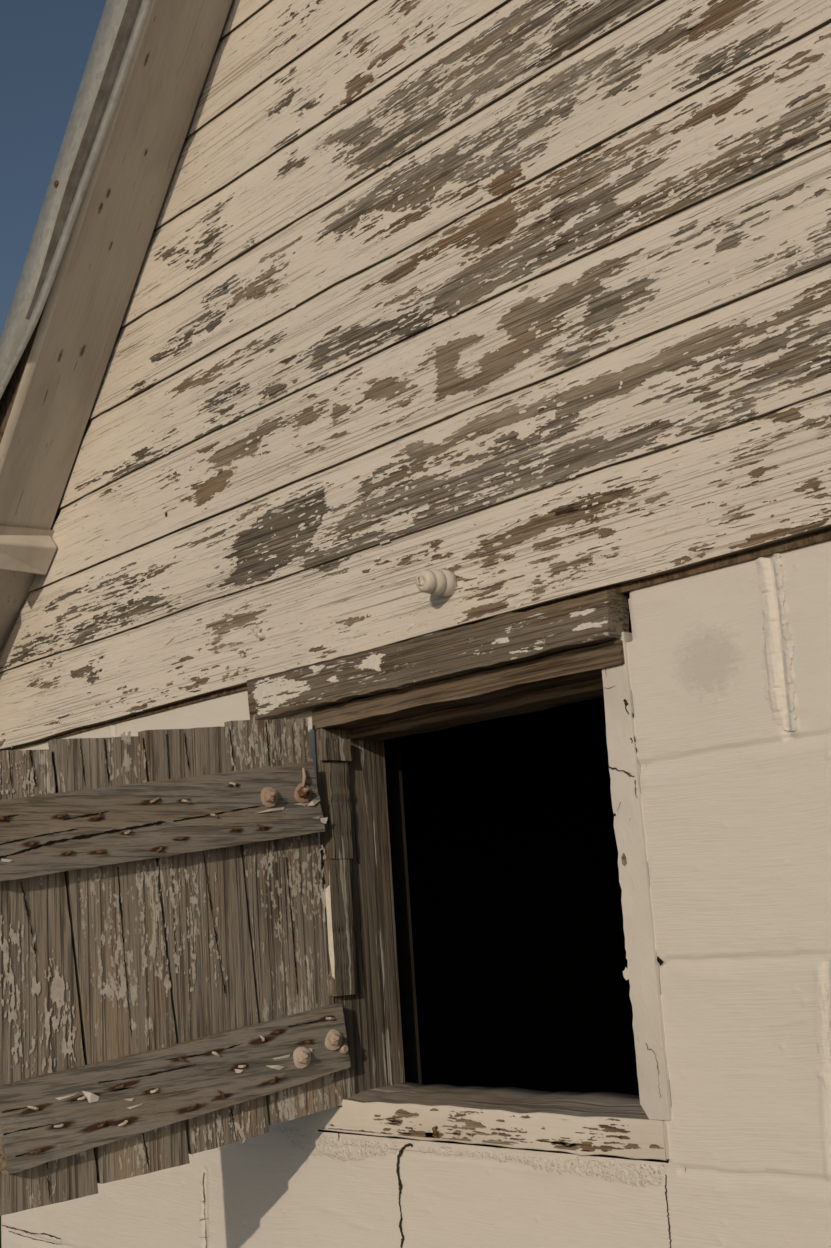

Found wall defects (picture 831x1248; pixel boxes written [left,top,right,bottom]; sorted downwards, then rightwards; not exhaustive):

peeling [0,0,831,771]
peeling [78,850,228,1011]
peeling [244,838,326,938]
peeling [0,915,76,1075]
corrosion [249,1029,285,1045]
corrosion [21,1104,50,1114]
corrosion [49,1117,137,1132]
corrosion [67,1080,157,1101]
corrosion [179,1093,233,1114]
spalling [191,1078,664,1188]
crack [396,1143,413,1248]
crack [664,1174,672,1248]